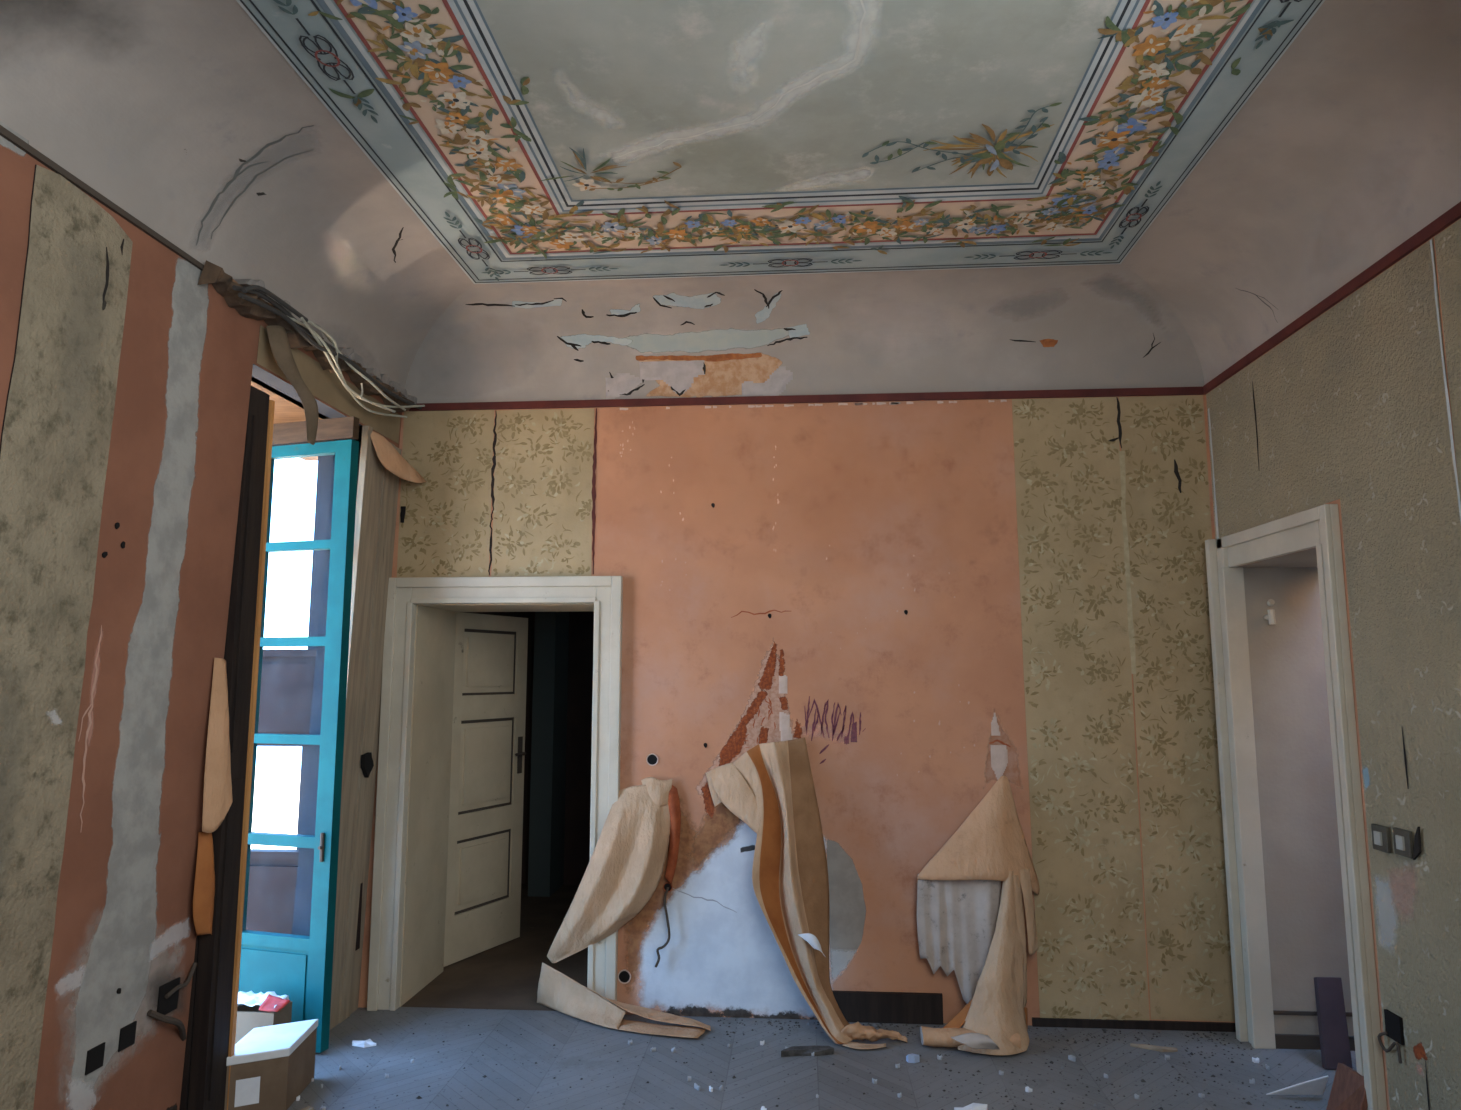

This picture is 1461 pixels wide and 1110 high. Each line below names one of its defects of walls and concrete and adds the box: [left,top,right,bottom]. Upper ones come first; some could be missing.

spalling [557,289,913,457]
spalling [646,753,658,766]
peeling [718,642,802,766]
flaking render [618,782,818,1020]
spalling [85,962,197,1075]